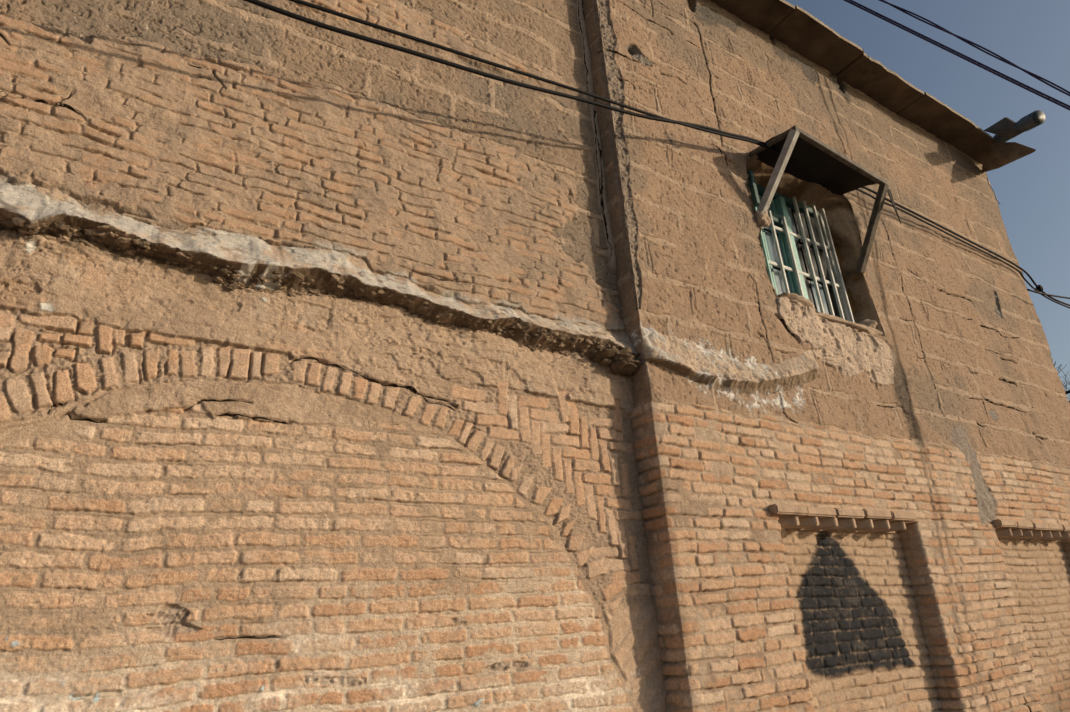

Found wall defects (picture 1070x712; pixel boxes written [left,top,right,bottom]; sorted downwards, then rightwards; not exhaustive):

crack [0,91,79,115]
flaking render [776,297,896,386]
crack [295,357,457,411]
crack [47,403,103,423]
crack [184,399,287,424]